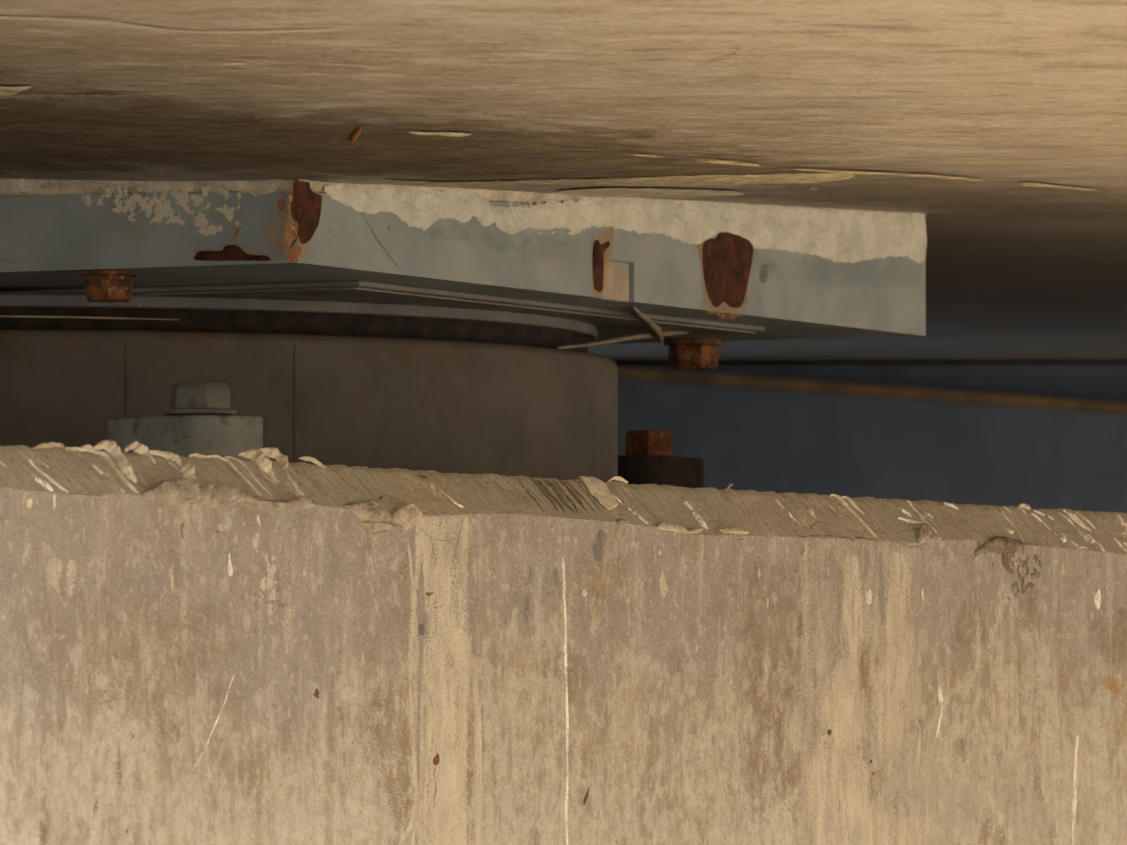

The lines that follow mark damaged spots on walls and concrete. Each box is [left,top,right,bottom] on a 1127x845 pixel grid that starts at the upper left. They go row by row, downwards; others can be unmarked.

peeling [0,178,284,236]
corrosion [182,179,324,264]
peeling [385,162,856,198]
corrosion [591,227,614,298]
corrosion [697,232,758,320]
damp [29,440,326,511]
peeling [578,476,629,544]
damp [999,504,1127,553]
spalling [970,536,1041,599]
damp [356,470,497,845]
damp [548,530,630,845]
damp [736,494,1056,845]